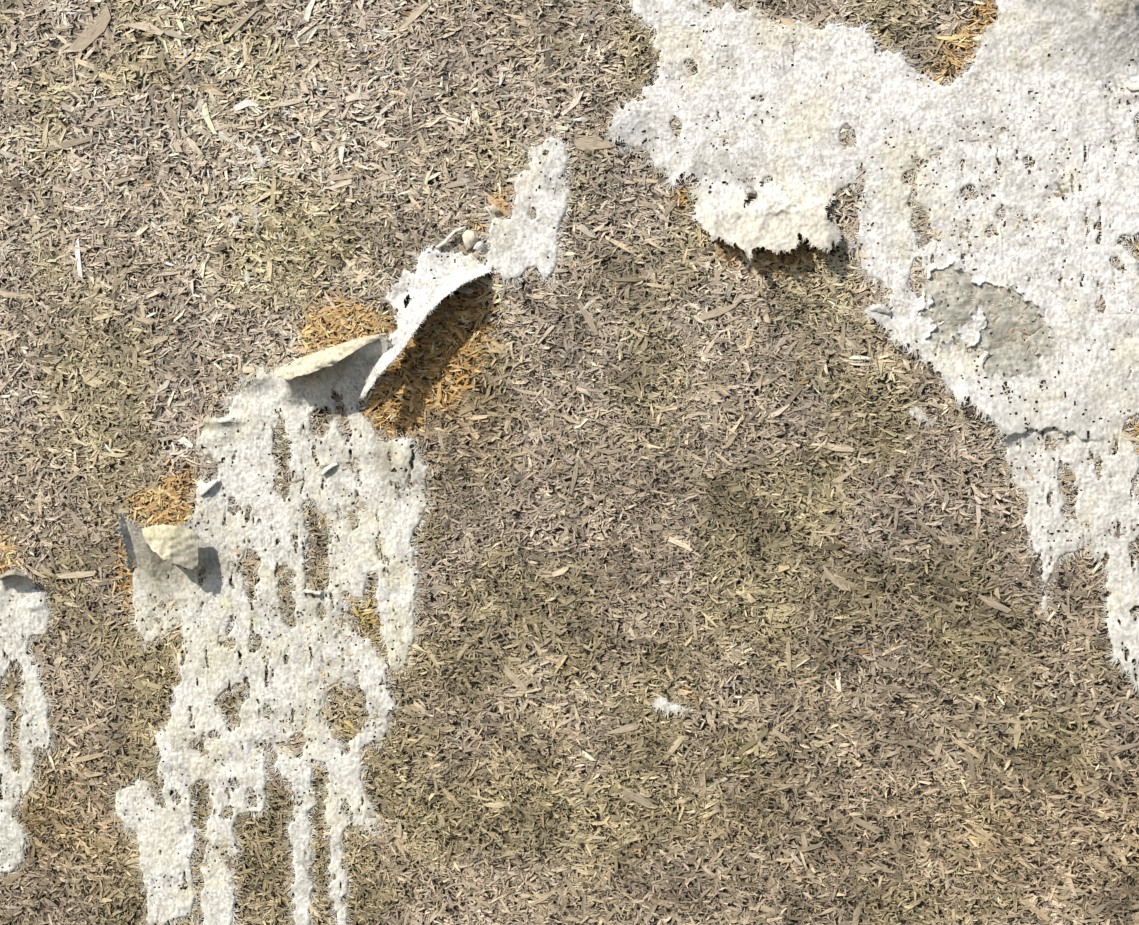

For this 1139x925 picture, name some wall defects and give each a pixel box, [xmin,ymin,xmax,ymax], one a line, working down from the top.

peeling [228,202,262,235]
peeling [906,404,936,430]